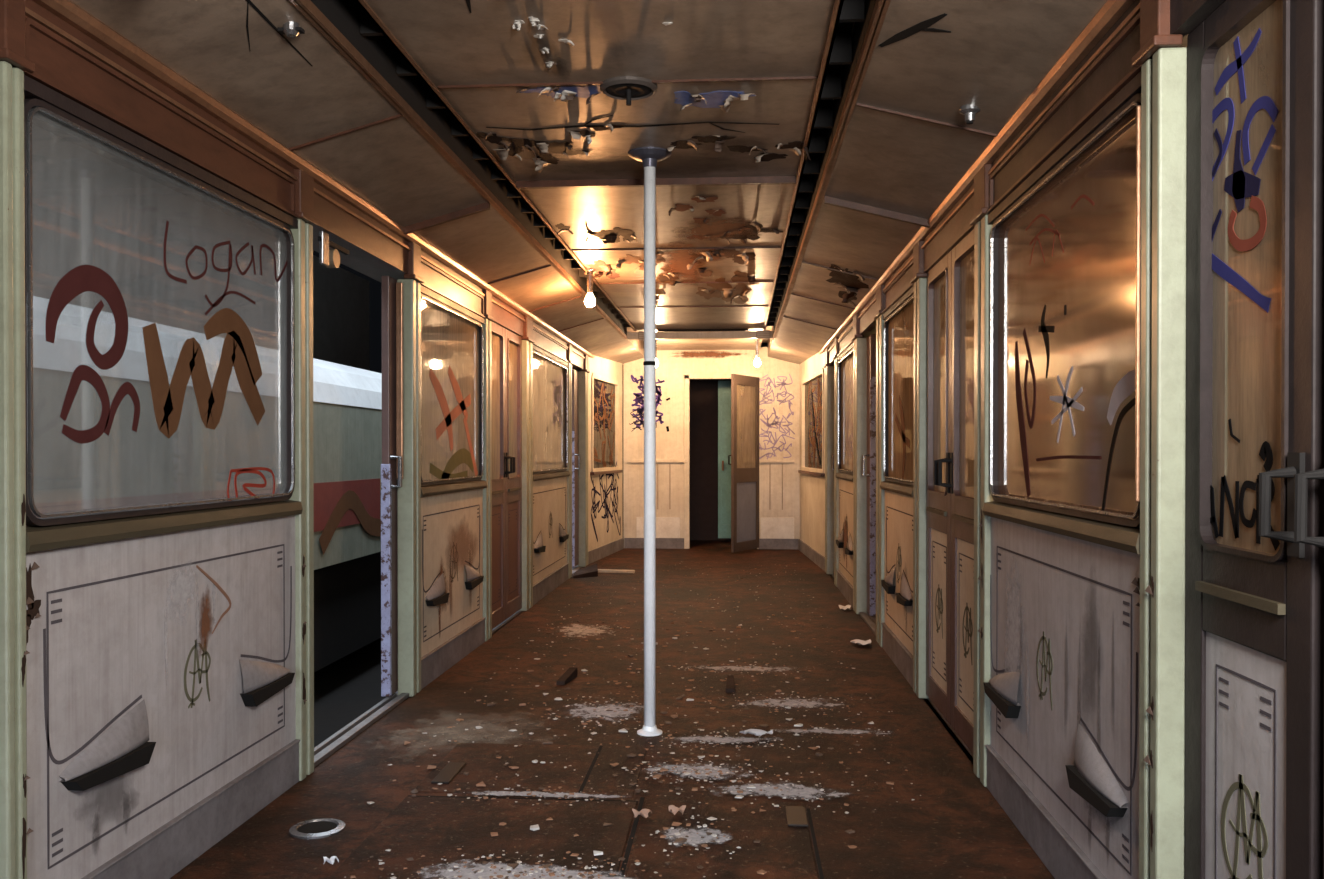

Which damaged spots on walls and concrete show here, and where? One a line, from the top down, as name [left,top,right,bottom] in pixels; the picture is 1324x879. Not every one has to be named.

peeling [674,91,756,113]
peeling [477,124,626,173]
peeling [667,135,811,162]
peeling [555,196,783,305]